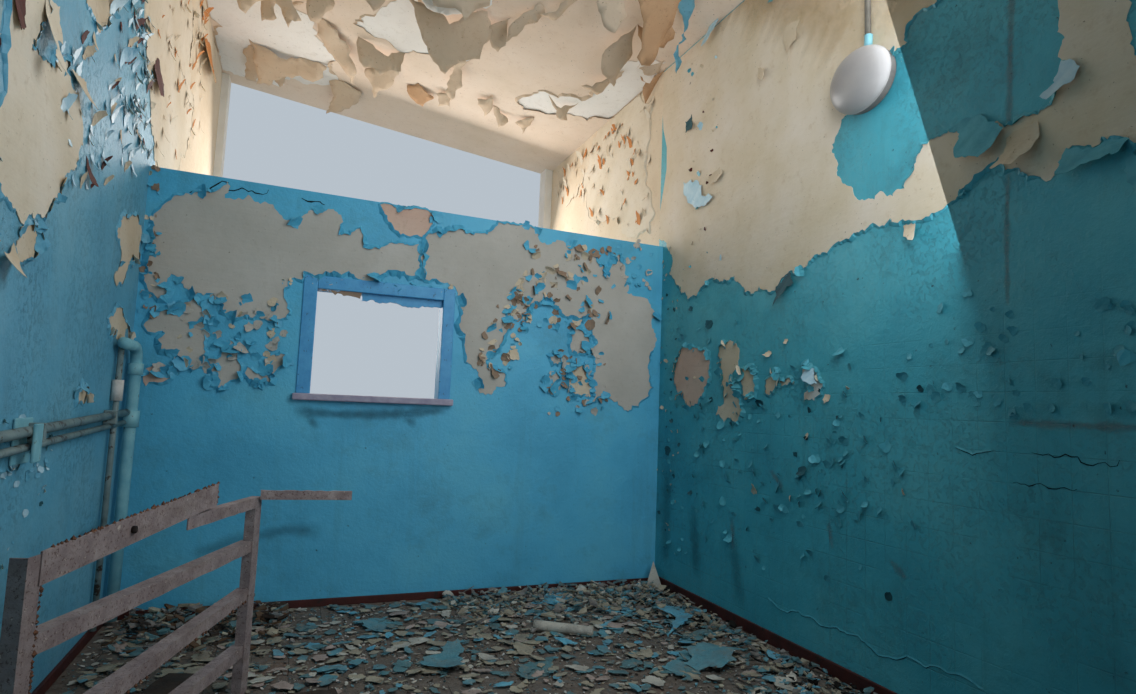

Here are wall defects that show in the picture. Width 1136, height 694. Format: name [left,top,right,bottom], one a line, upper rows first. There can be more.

peeling [0,0,1136,555]
crack [768,598,984,690]